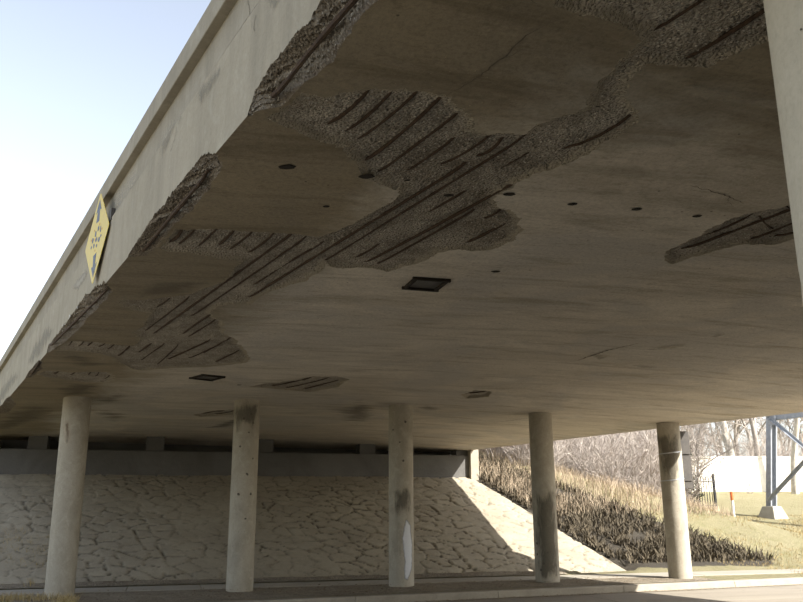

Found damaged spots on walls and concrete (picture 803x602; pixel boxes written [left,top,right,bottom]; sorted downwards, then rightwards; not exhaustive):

spalling [47,0,768,370]
spalling [664,205,794,264]
spalling [248,376,349,392]